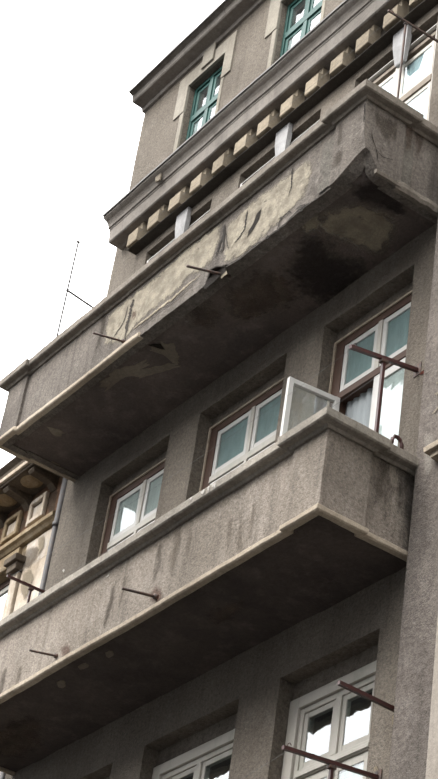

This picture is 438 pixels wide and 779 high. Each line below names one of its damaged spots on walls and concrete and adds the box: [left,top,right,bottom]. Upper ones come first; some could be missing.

crack [215,168,322,265]
damp [355,183,402,213]
crack [113,299,134,338]